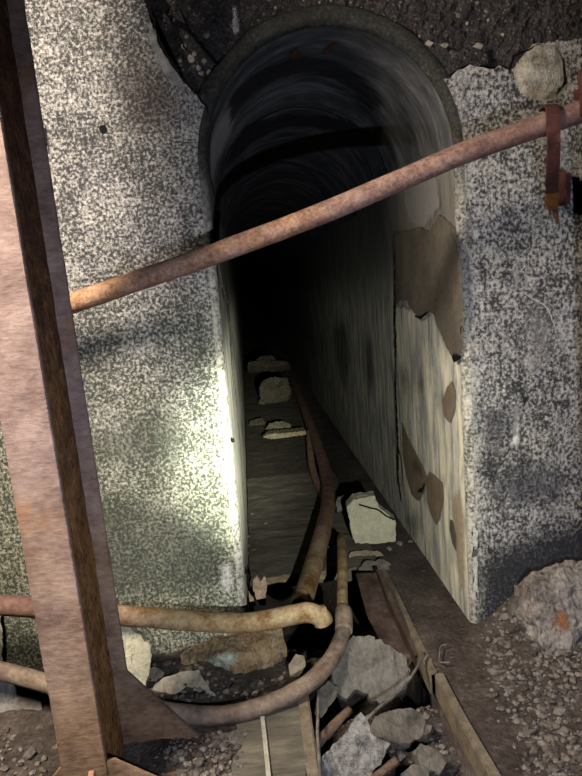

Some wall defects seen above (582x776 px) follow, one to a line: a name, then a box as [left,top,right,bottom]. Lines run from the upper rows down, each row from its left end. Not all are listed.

crack [144,0,218,113]
spalling [147,0,582,95]
peeling [395,215,464,362]
spalling [443,381,455,423]
spalling [402,423,443,524]